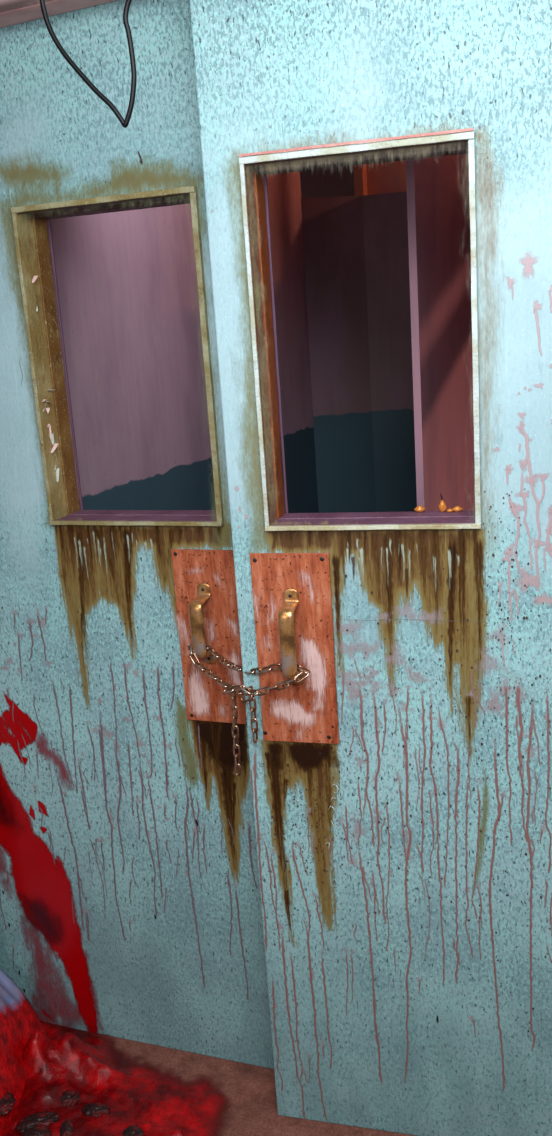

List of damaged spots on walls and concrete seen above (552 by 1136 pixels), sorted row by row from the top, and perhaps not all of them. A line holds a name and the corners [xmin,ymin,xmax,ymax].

rust [36,519,233,717]
rust [165,689,439,942]
rust [264,489,552,922]